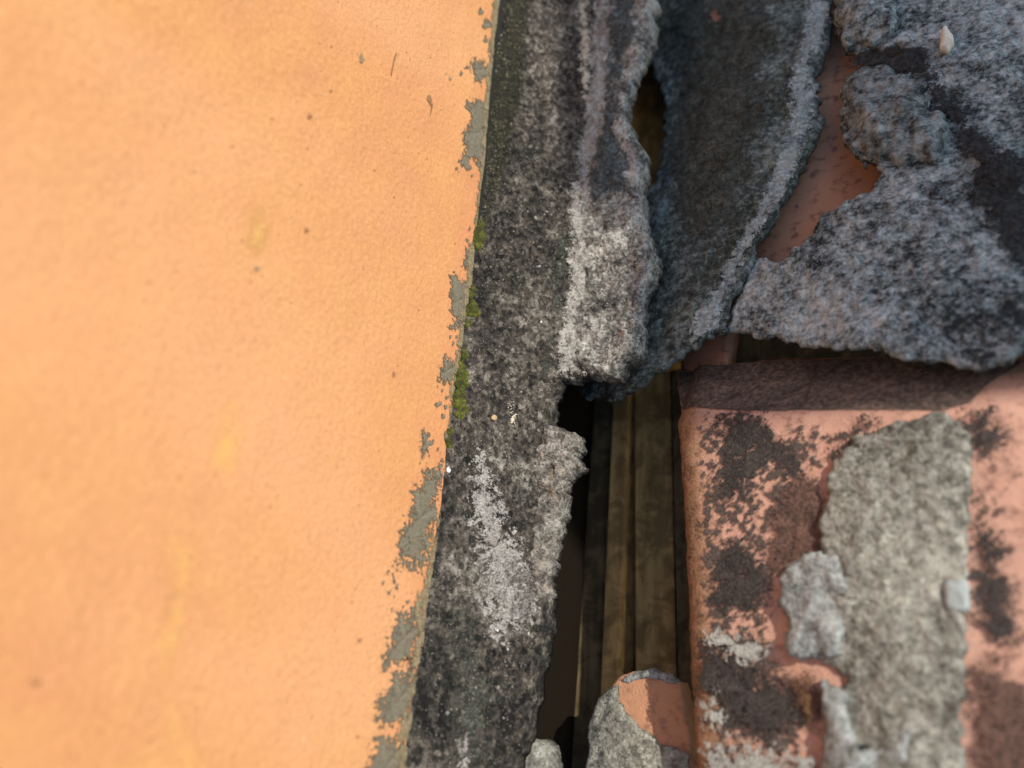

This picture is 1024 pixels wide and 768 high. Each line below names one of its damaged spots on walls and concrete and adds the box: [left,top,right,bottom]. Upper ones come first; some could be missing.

peeling [362,0,500,768]
spalling [530,425,589,599]
leakage [679,359,1024,768]